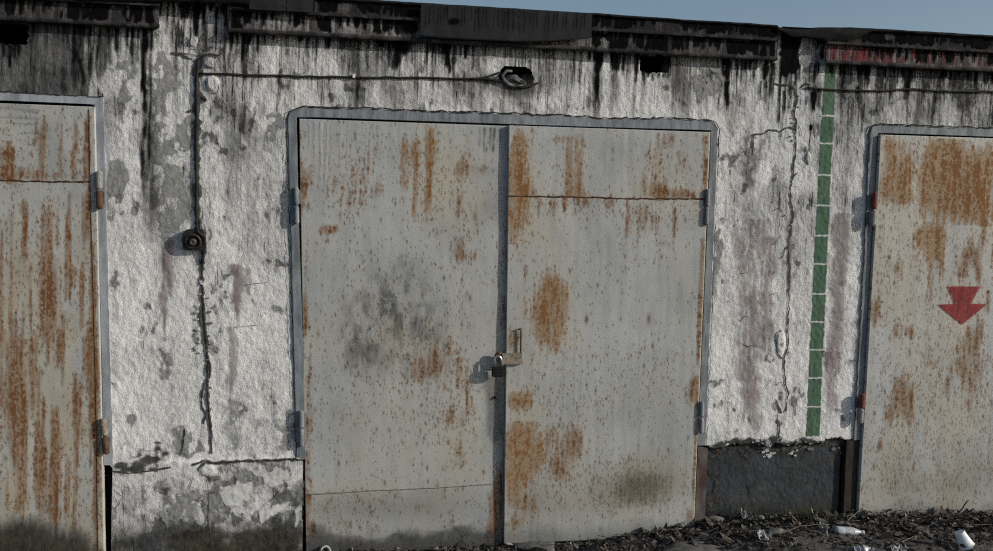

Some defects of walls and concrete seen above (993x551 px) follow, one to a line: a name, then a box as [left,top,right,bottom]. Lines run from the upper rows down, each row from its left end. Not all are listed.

leakage [0,0,278,216]
peeling [147,51,195,242]
crack [547,61,562,107]
leakage [289,0,993,122]
corrosion [0,112,101,551]
crack [112,37,303,532]
crack [741,83,811,438]
leakage [827,212,849,399]
corrosion [880,138,993,393]
peeling [158,462,290,536]
corrosion [488,391,583,539]
flaking render [712,436,844,459]